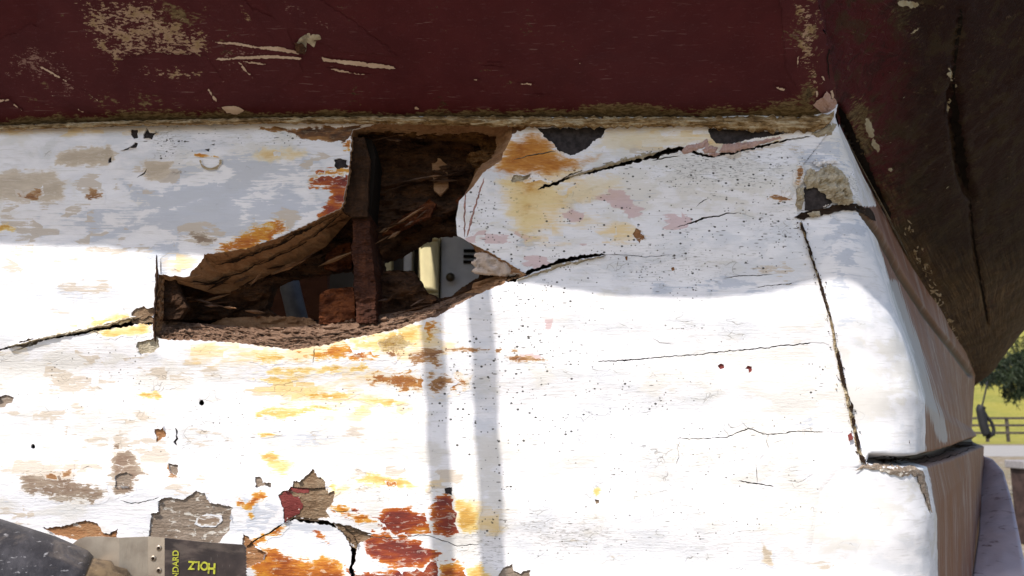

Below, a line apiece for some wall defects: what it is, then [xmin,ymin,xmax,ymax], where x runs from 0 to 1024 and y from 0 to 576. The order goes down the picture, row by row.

peeling [0,0,396,114]
peeling [779,0,833,108]
corrosion [305,162,350,221]
corrosion [481,125,608,251]
crack [538,138,803,190]
crack [506,253,664,282]
crack [598,107,976,464]
crack [0,316,153,351]
peeling [149,491,233,543]
peeling [254,469,371,550]
corrosion [247,479,493,576]
peeling [498,564,530,576]